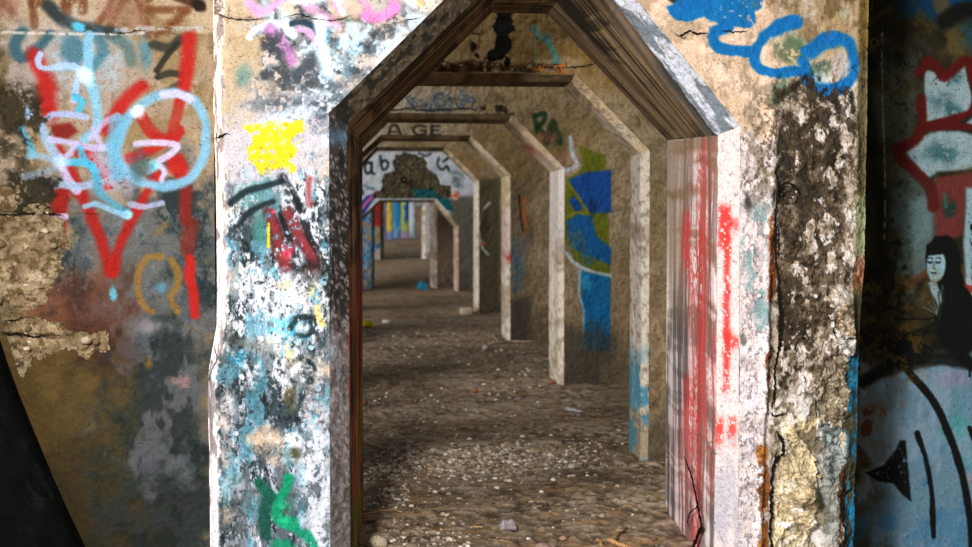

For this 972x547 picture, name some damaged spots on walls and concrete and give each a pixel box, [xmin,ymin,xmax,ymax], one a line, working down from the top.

crack [216,6,259,21]
crack [290,13,350,22]
crack [676,30,749,39]
spalling [433,57,558,73]
spalling [776,183,800,205]
water stain [769,74,907,397]
spalling [0,186,110,378]
spalling [834,301,856,338]
crack [768,162,801,547]
spalling [769,357,851,547]